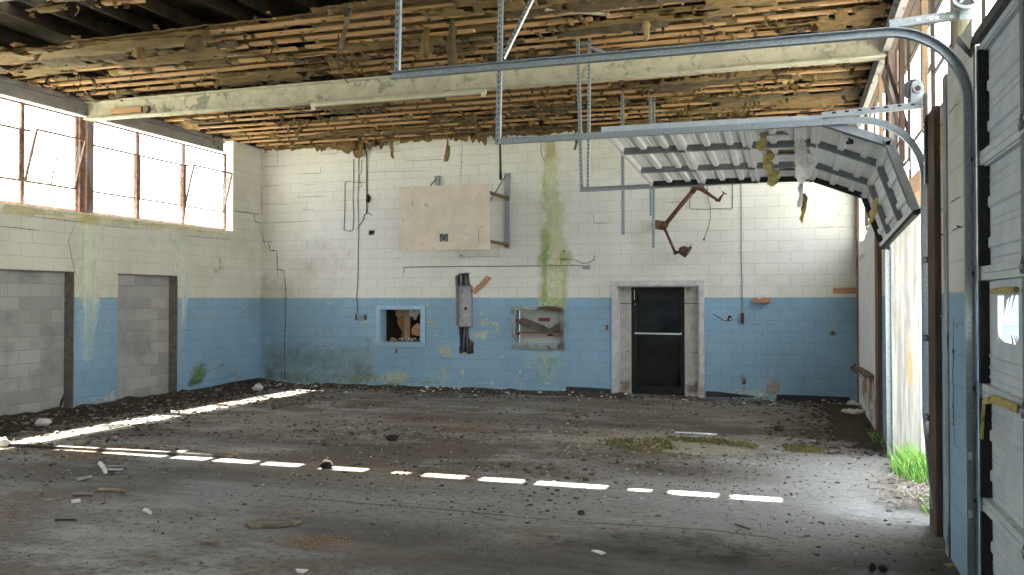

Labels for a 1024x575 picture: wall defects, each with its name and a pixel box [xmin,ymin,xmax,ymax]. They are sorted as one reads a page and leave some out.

peeling [145,92,228,115]
crack [236,152,325,380]
spalling [426,302,501,382]